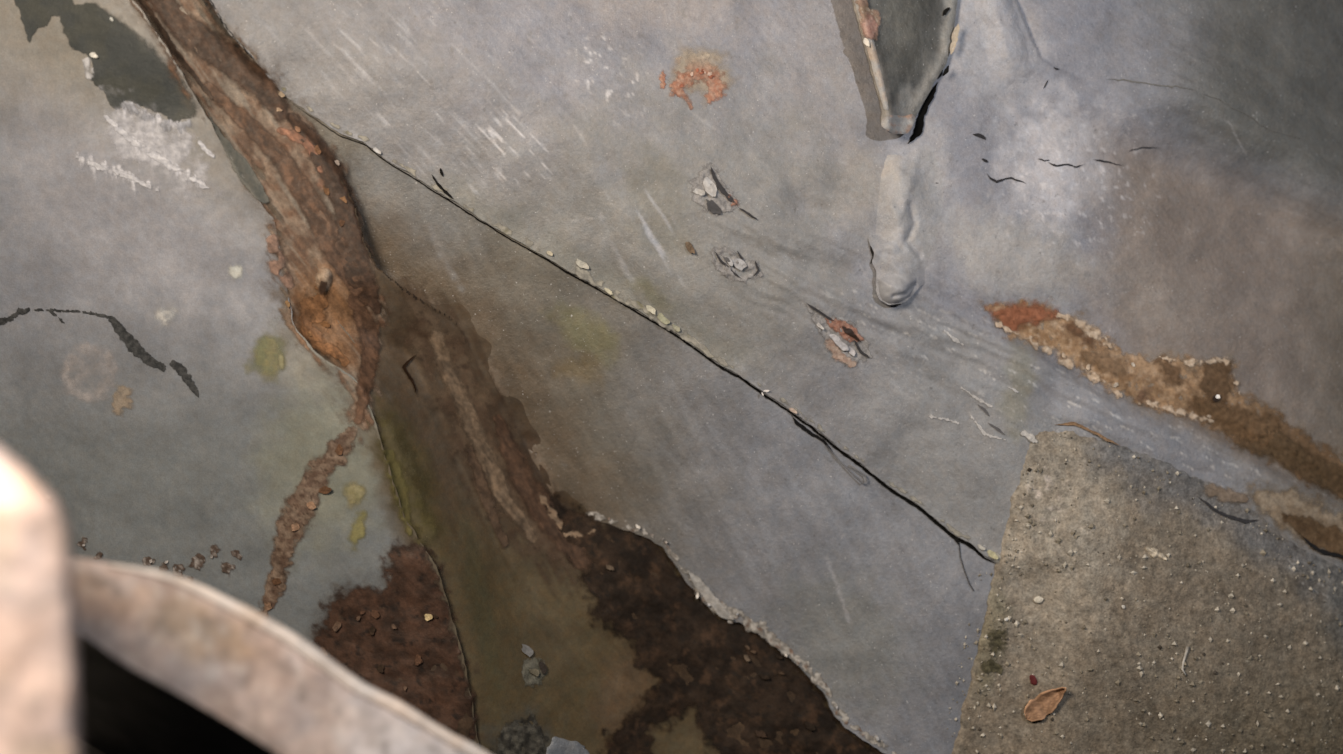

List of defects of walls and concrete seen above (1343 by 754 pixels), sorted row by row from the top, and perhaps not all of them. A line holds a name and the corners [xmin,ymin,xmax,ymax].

peeling [14,0,269,203]
crack [973,133,1158,184]
spalling [689,163,757,220]
crack [0,307,199,397]
rust [130,0,883,754]
crack [290,102,996,564]
spalling [806,304,872,366]
crack [977,404,1005,435]
crack [1199,497,1256,523]
peeling [585,512,897,754]
spalling [521,644,547,687]